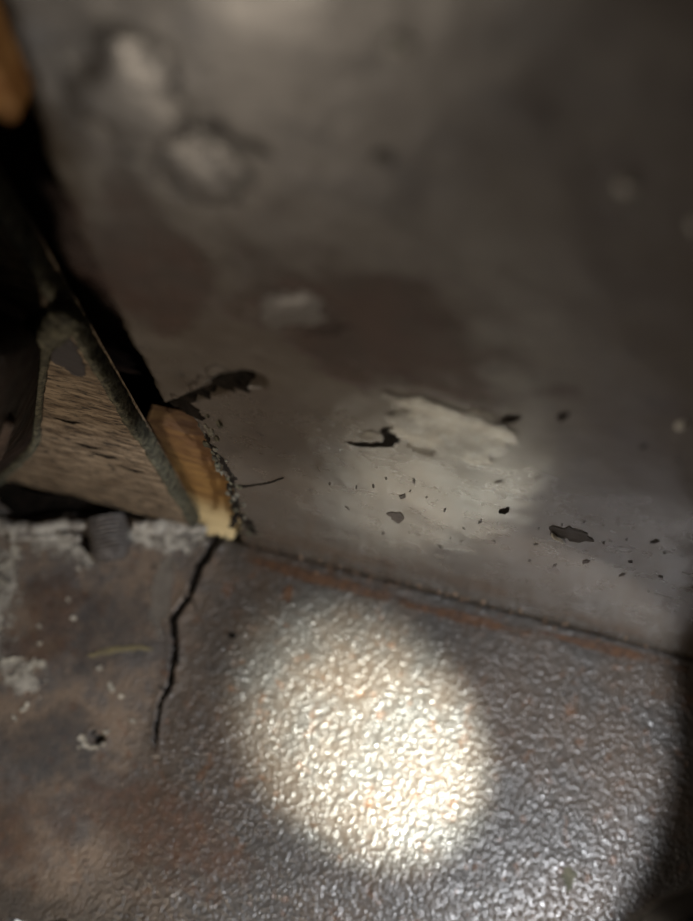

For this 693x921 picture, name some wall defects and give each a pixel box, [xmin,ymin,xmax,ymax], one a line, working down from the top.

peeling [359,392,521,465]
crack [153,365,284,750]
peeling [387,512,404,523]
peeling [549,526,594,544]